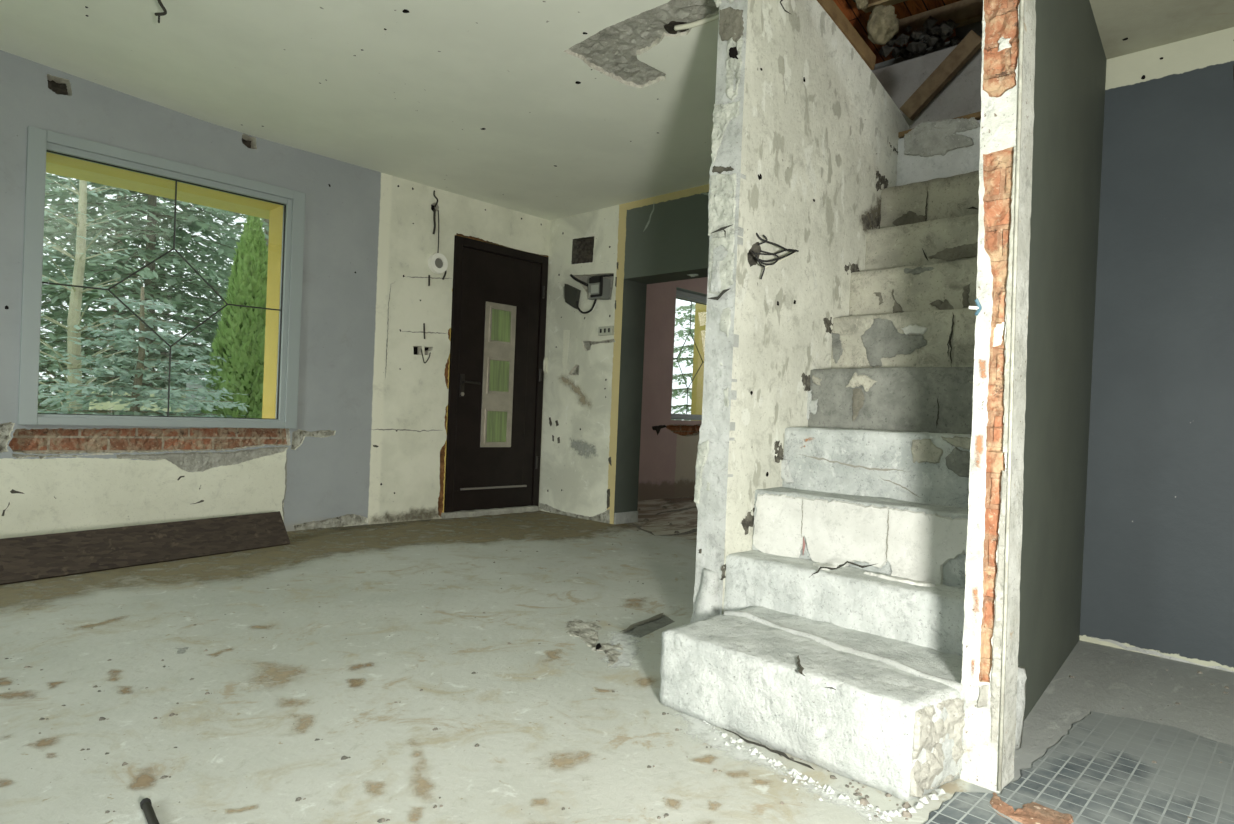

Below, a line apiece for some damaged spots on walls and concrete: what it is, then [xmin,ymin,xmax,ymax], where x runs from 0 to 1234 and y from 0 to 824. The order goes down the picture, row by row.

flaking render [983,0,1020,98]
spalling [564,0,761,295]
flaking render [892,211,926,226]
flaking render [861,290,927,367]
flaking render [0,422,336,504]
flaking render [652,424,709,504]
flaking render [904,117,1016,798]
crack [798,454,921,577]
flaking render [752,493,968,587]